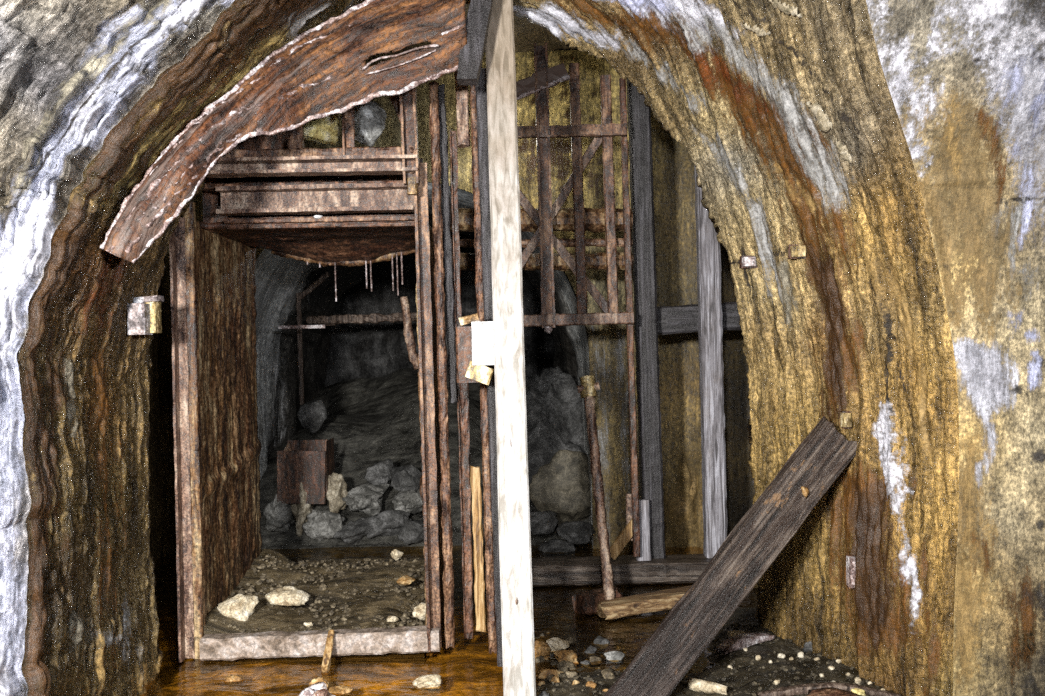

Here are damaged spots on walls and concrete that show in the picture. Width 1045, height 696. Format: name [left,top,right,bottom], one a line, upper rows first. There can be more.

corrosion [518,119,537,184]
corrosion [550,81,571,202]
corrosion [554,0,865,426]
leakage [866,0,1045,278]
crack [995,196,1043,204]
leakage [953,313,1041,486]
leakage [873,402,921,619]